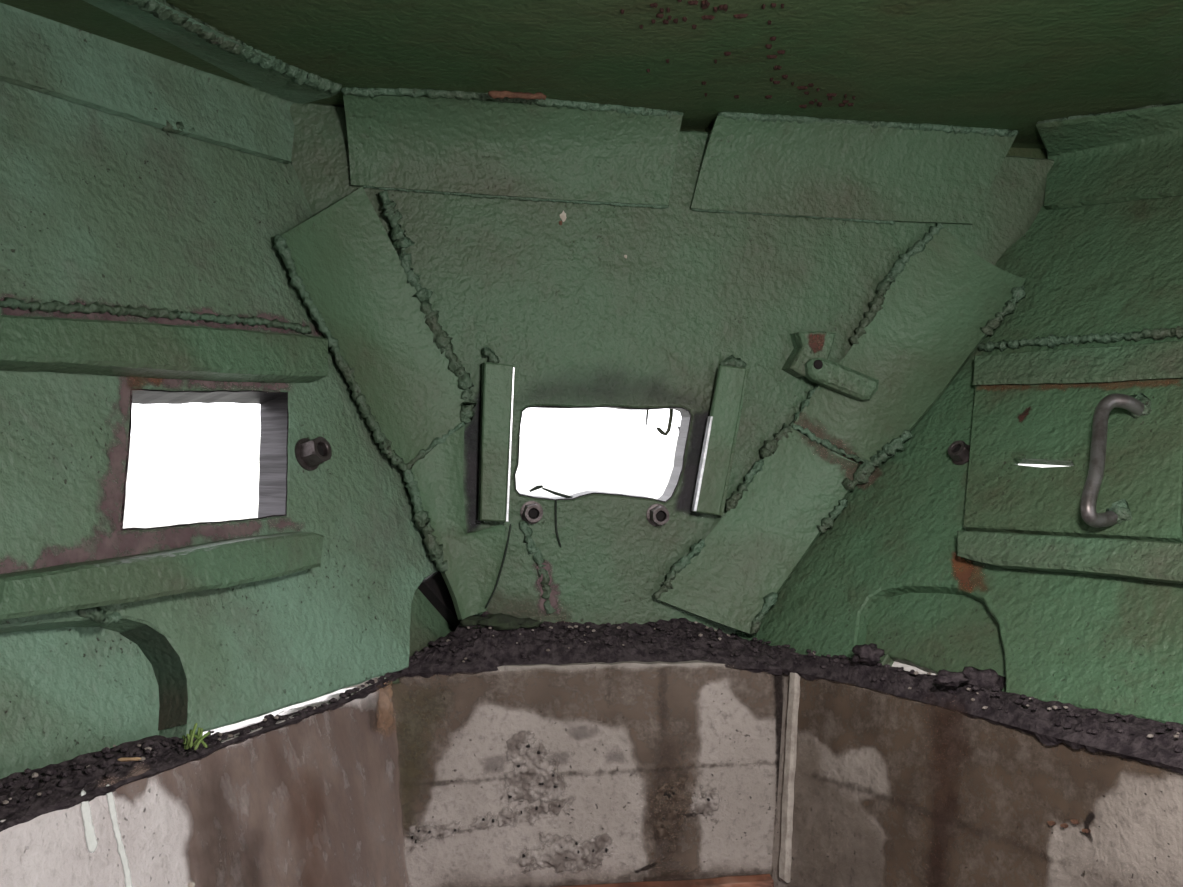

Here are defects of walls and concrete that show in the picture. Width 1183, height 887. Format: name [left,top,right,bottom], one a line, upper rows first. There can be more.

rust [488,90,546,100]
rust [809,334,825,353]
rust [952,552,985,591]
damp [101,666,1168,887]
spalling [409,731,612,873]